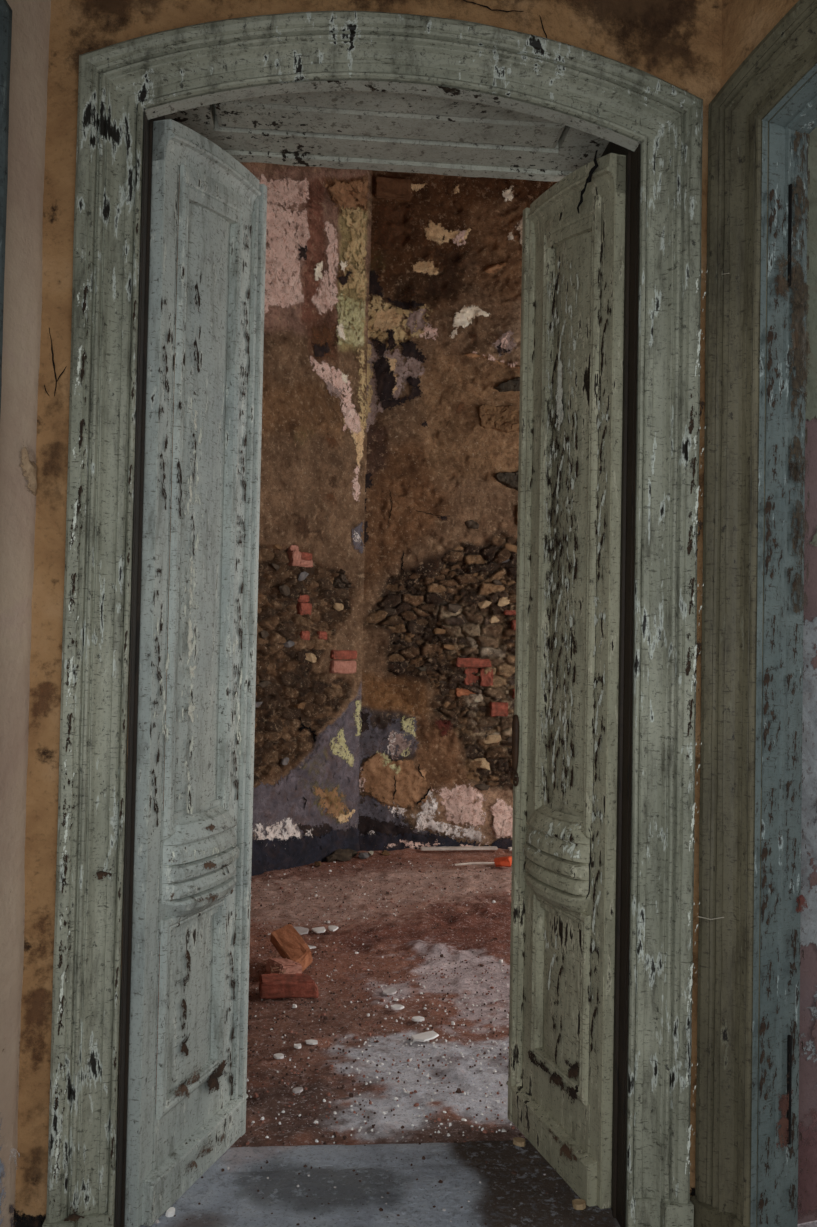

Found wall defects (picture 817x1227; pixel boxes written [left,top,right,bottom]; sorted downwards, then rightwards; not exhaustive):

peeling [230,173,494,823]
peeling [502,186,514,202]
peeling [507,217,523,244]
peeling [446,245,611,1104]
peeling [757,127,817,1225]
peeling [549,1129,577,1164]